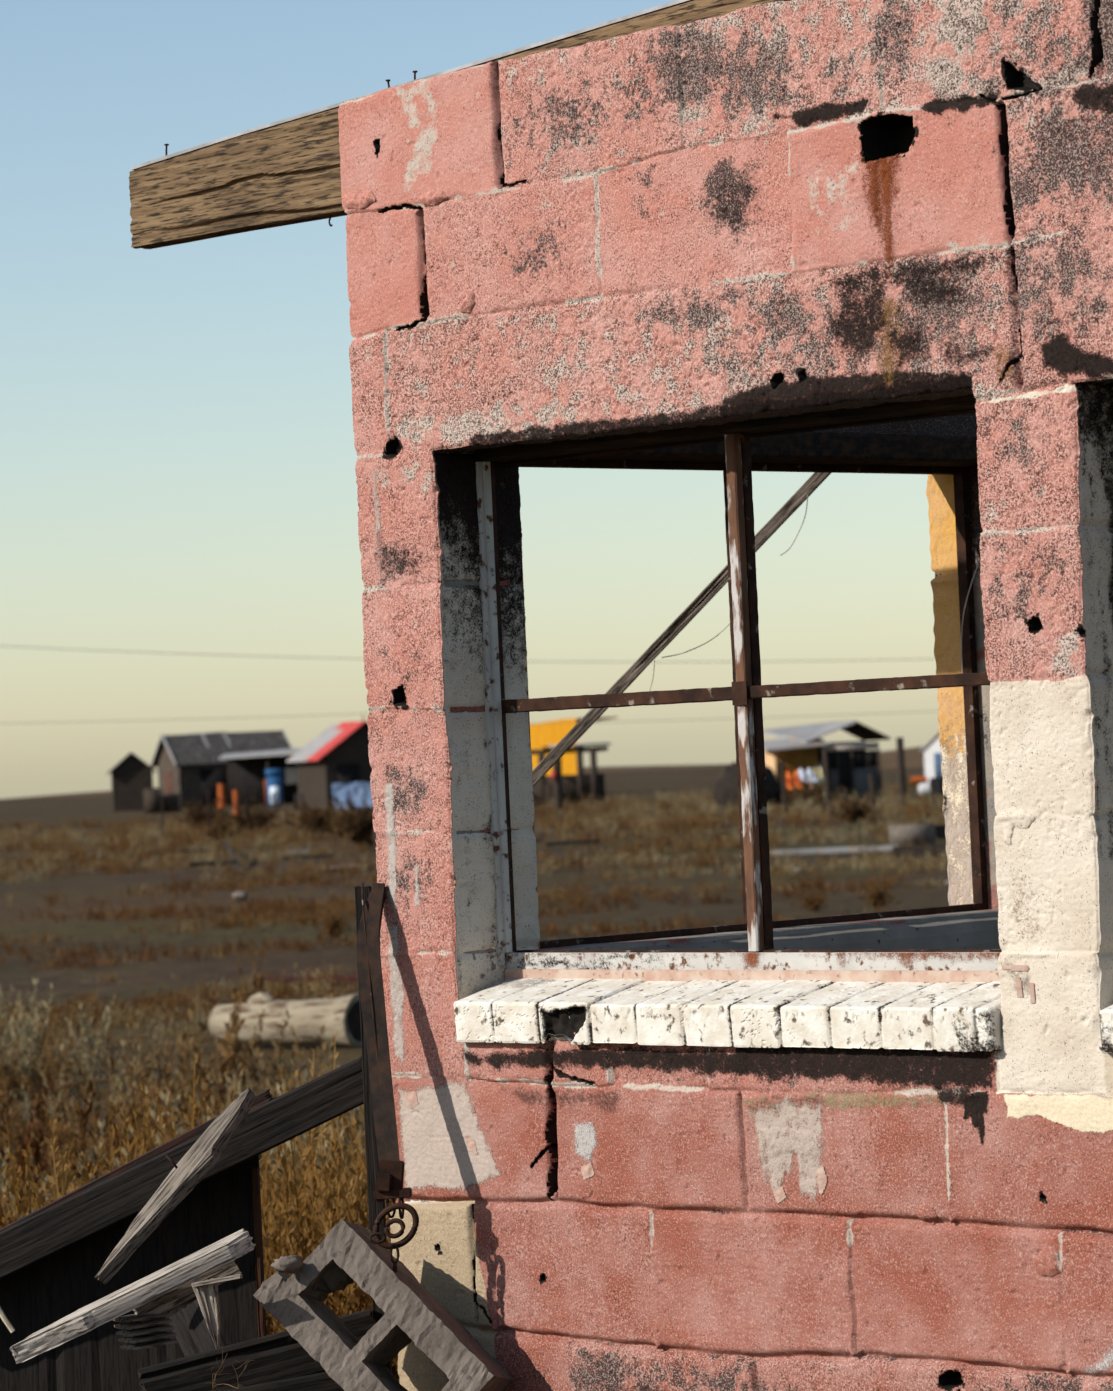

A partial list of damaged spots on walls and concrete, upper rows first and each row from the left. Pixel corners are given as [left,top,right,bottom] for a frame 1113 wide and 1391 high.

rust [859,154,900,274]
spalling [541,1005,589,1043]
peeling [397,1081,500,1191]
crack [530,1050,595,1200]
peeling [574,1122,597,1180]
peeling [748,1093,827,1205]